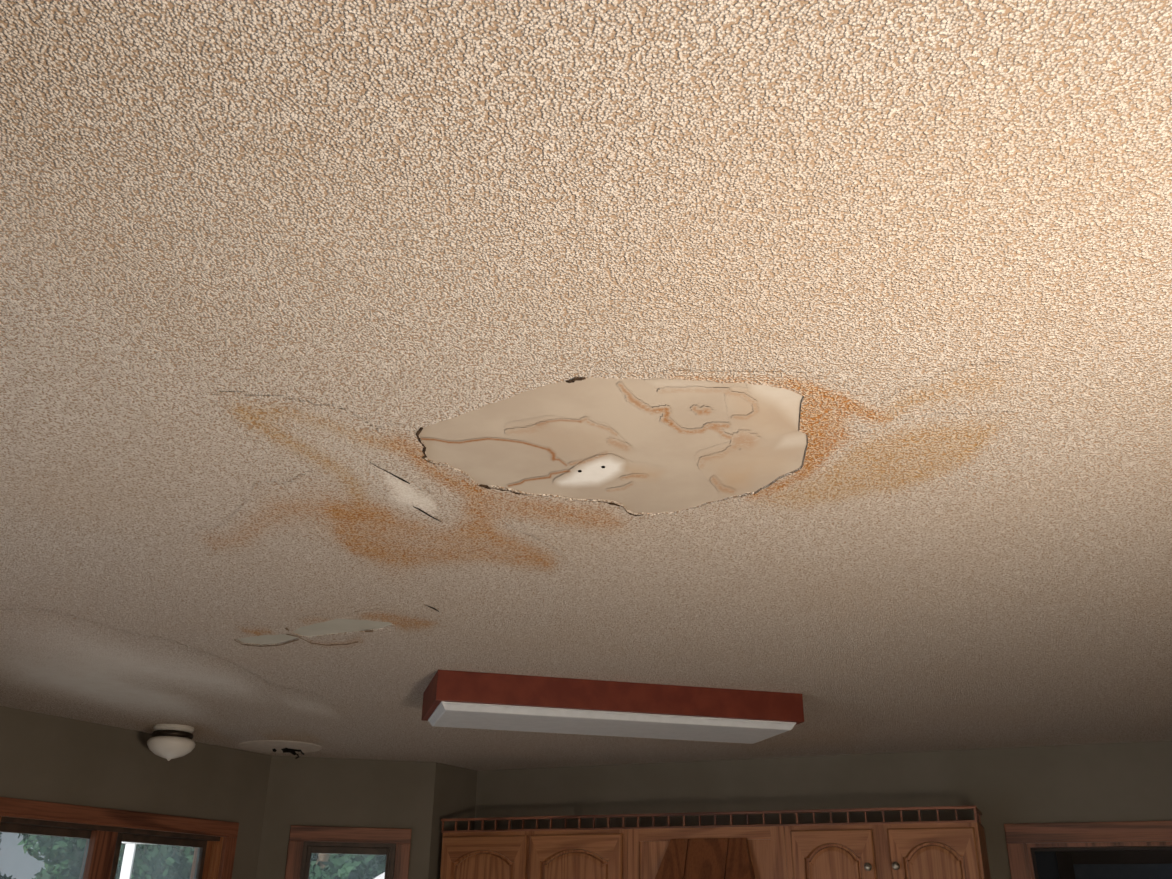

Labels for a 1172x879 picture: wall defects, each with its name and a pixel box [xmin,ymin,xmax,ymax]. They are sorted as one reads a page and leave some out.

water stain [190,392,634,584]
water stain [664,362,1022,514]
peeling [234,619,392,647]